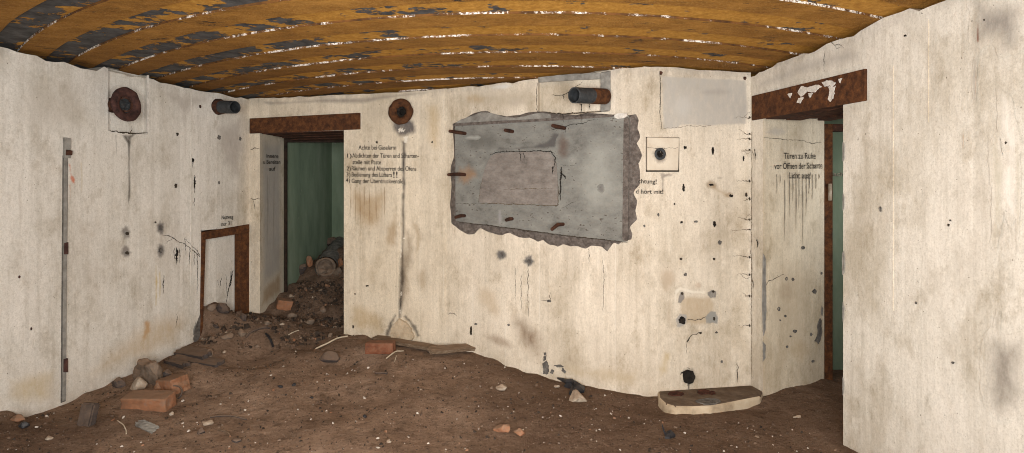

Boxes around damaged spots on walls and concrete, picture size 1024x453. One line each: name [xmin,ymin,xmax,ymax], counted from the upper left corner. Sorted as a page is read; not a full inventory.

peeling [787,78,842,103]
water stain [115,134,131,205]
corrosion [456,162,479,187]
water stain [346,139,427,335]
water stain [765,174,820,381]